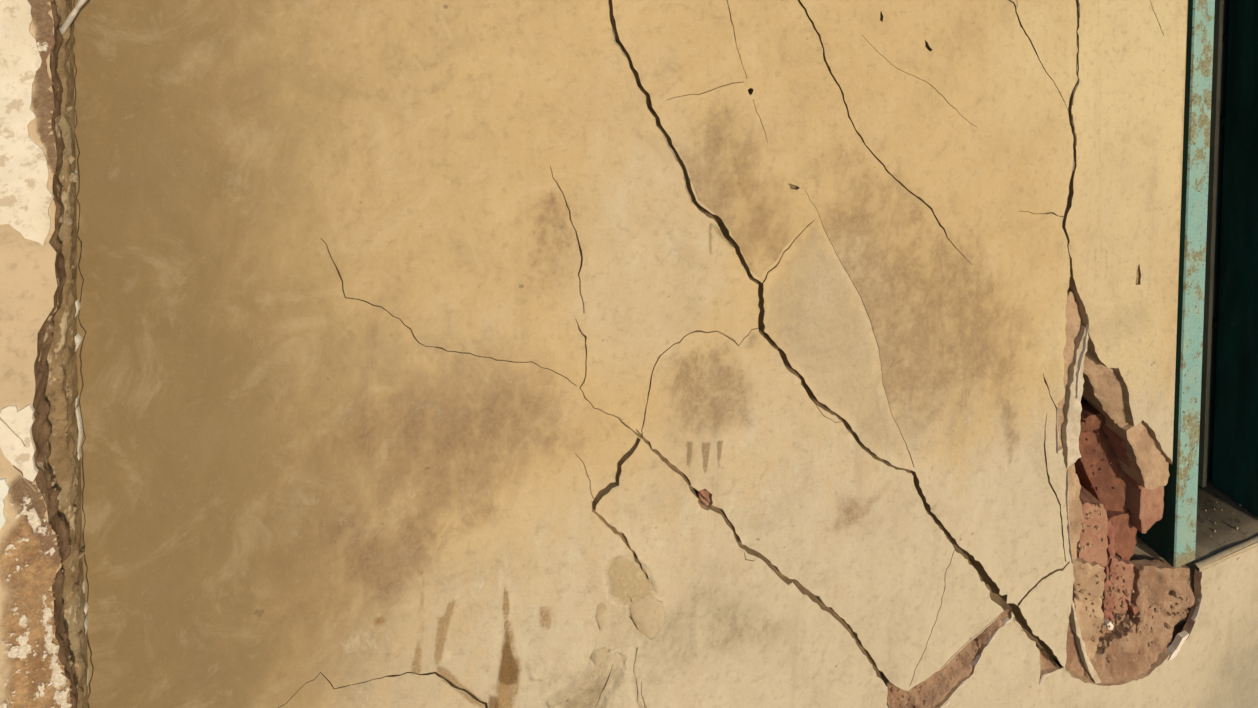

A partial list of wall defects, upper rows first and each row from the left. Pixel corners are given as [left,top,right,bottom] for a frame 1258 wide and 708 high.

spalling [0,0,89,708]
crack [73,0,89,602]
crack [86,639,94,708]
crack [278,672,488,708]
crack [321,0,1080,686]
spalling [881,601,1013,708]
spalling [1035,274,1203,686]